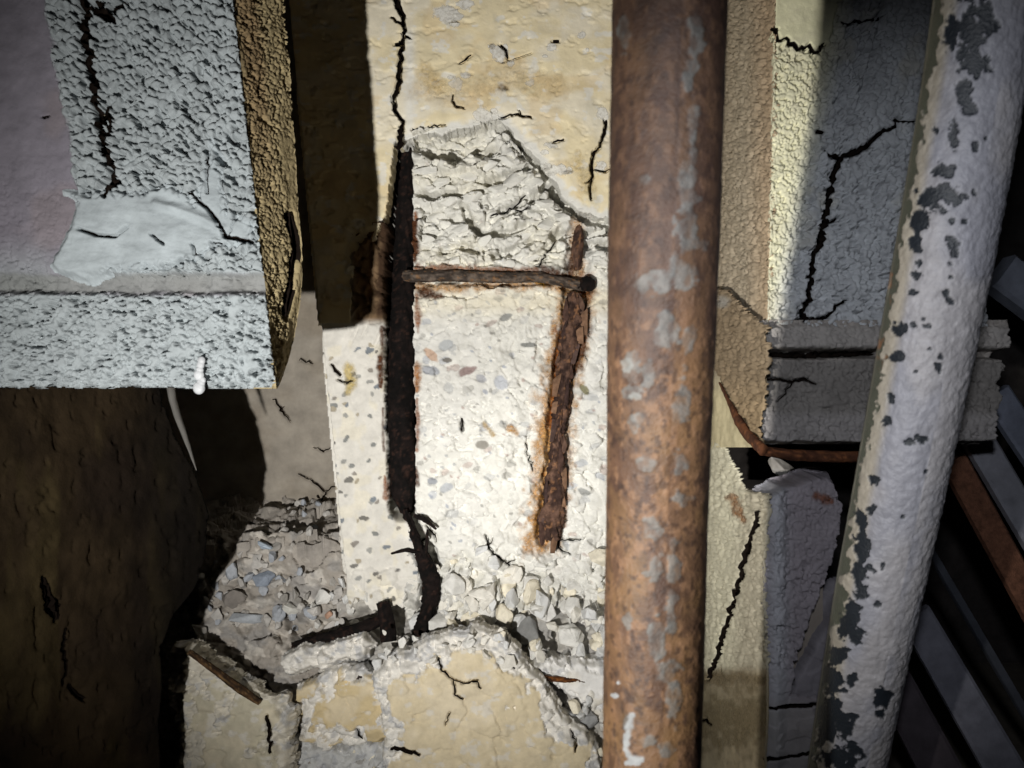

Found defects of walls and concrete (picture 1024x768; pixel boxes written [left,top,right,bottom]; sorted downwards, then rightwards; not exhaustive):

crack [79,0,128,197]
crack [390,0,464,151]
crack [500,110,532,119]
crack [500,40,559,63]
crack [586,120,610,200]
crack [769,118,915,326]
corrosion [376,326,388,388]
spalling [322,107,609,632]
corrosion [411,212,591,553]
crack [707,511,760,680]